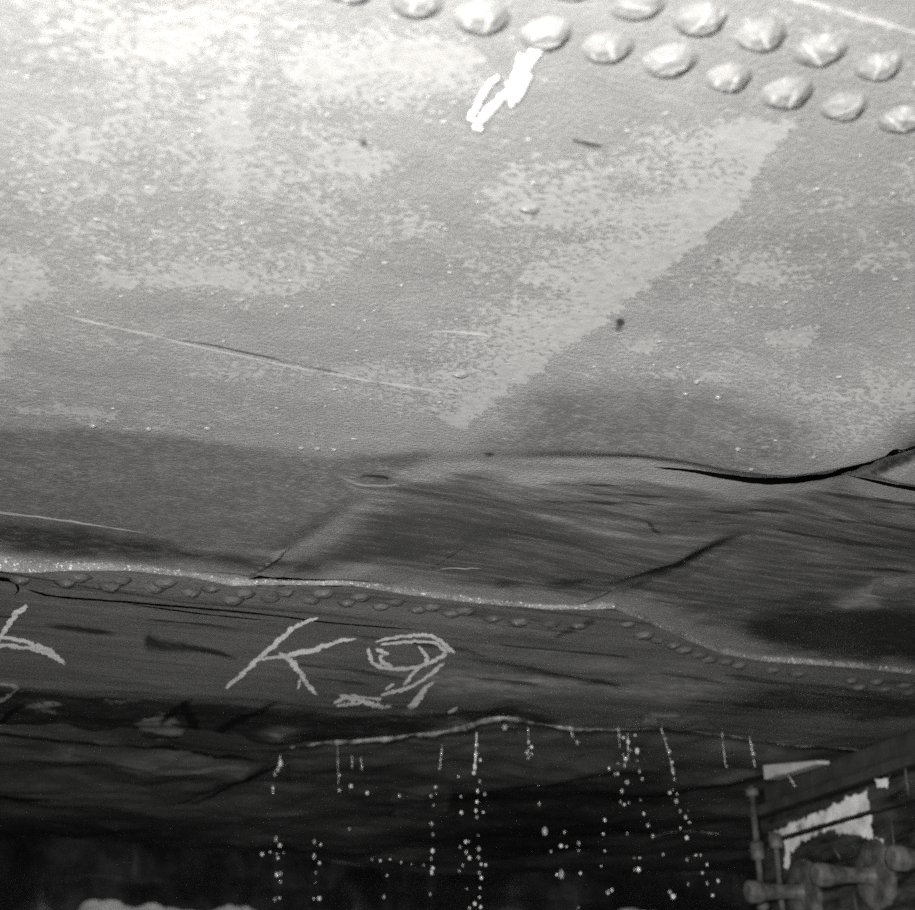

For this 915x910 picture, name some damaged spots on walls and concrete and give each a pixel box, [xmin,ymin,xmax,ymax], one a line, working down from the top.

crack [654,446,915,491]
water stain [429,776,667,855]
water stain [405,878,541,910]
water stain [618,892,728,910]